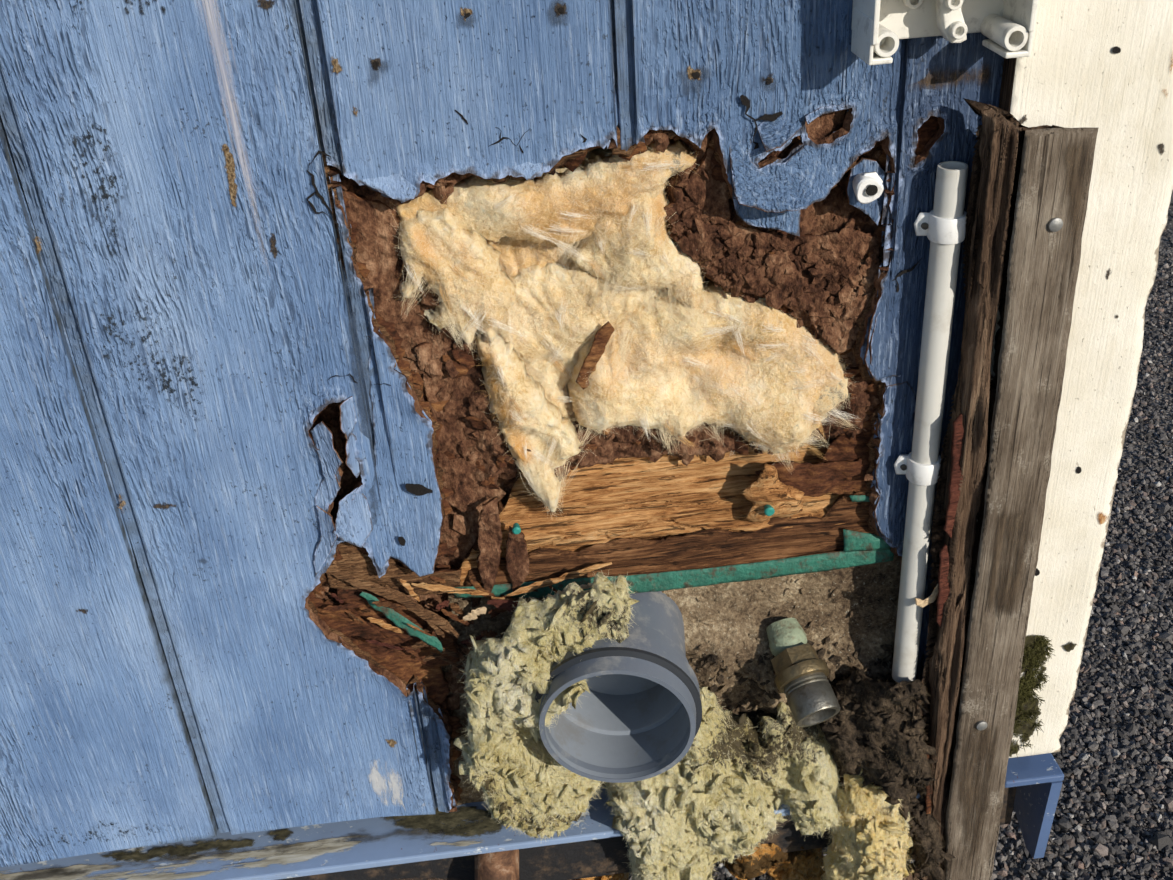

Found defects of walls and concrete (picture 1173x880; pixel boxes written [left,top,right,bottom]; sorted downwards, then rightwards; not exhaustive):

spalling [915,117,939,157]
peeling [514,162,543,180]
peeling [664,100,916,545]
peeling [310,174,530,705]
peeling [647,441,694,466]
peeling [0,835,362,880]